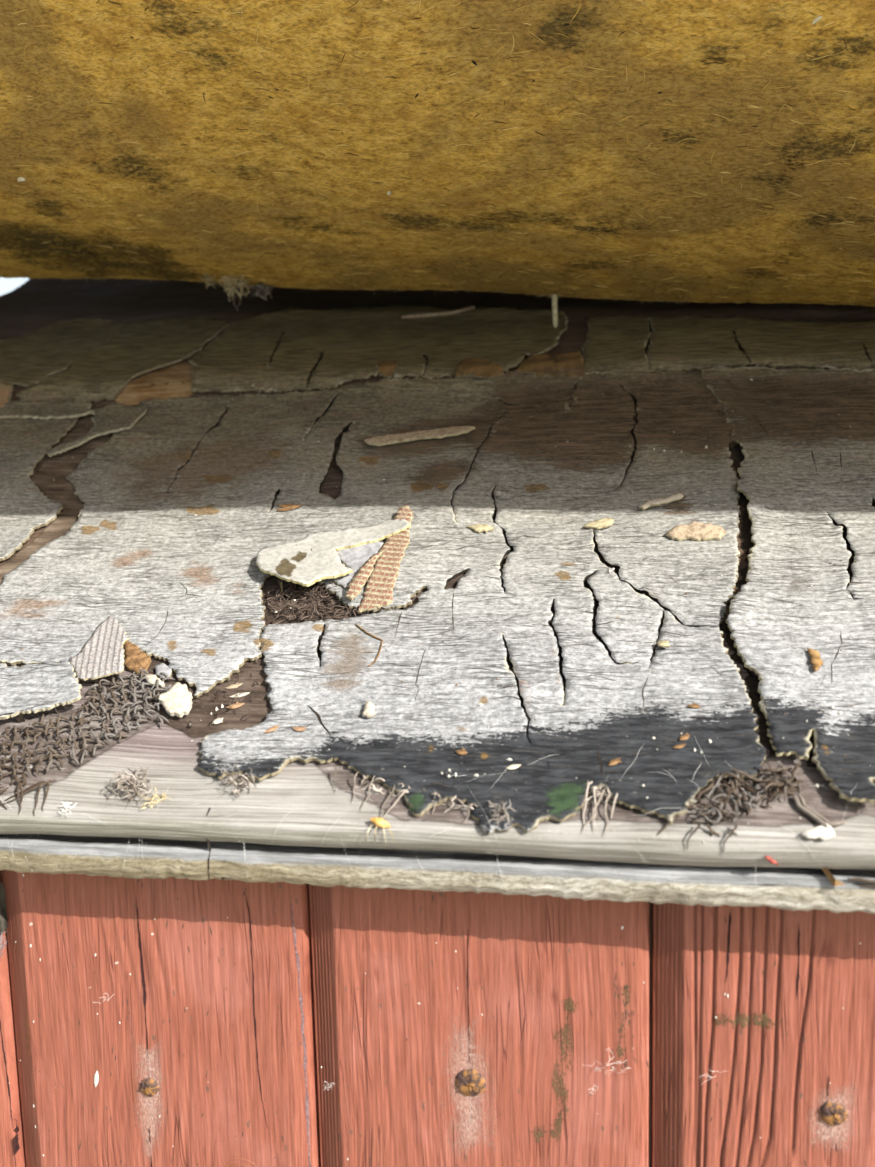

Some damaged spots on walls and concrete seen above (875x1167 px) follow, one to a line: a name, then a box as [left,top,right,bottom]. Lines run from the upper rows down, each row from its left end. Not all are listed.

peeling [0,363,195,584]
peeling [320,427,349,500]
peeling [256,519,411,626]
peeling [399,588,428,610]
crack [0,324,875,790]
peeling [445,572,466,589]
peeling [0,655,270,795]
peeling [317,760,480,825]
peeling [540,755,875,827]
leakage [528,998,577,1143]